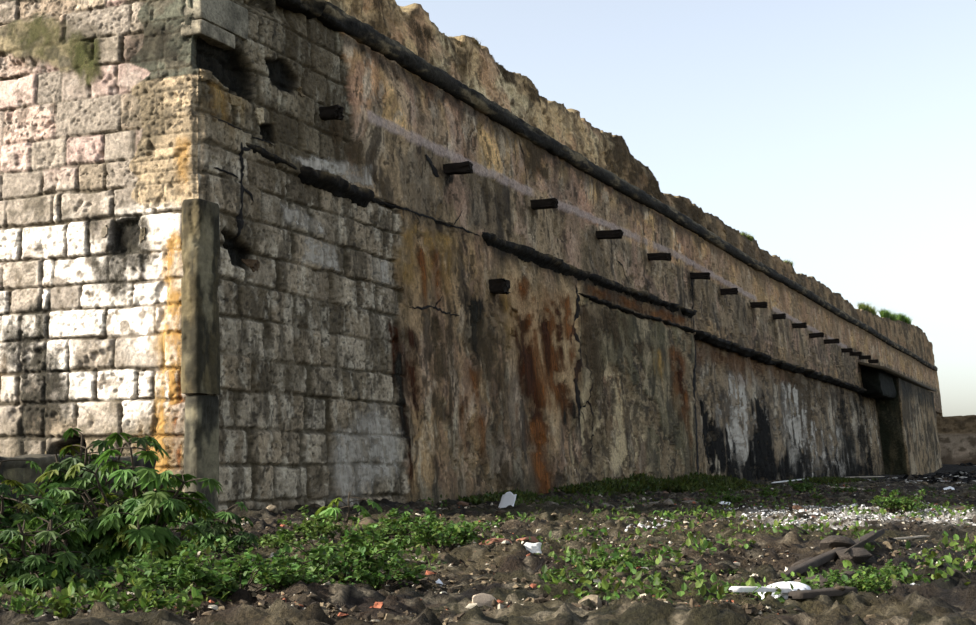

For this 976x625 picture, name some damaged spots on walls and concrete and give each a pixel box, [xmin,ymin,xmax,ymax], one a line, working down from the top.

crack [210,115,274,239]
spalling [59,437,92,456]
damp [91,218,151,296]
spalling [101,218,146,256]
rust [150,232,183,474]
crack [408,297,460,316]
rust [504,279,575,493]
crack [570,282,594,456]
damp [700,374,873,481]